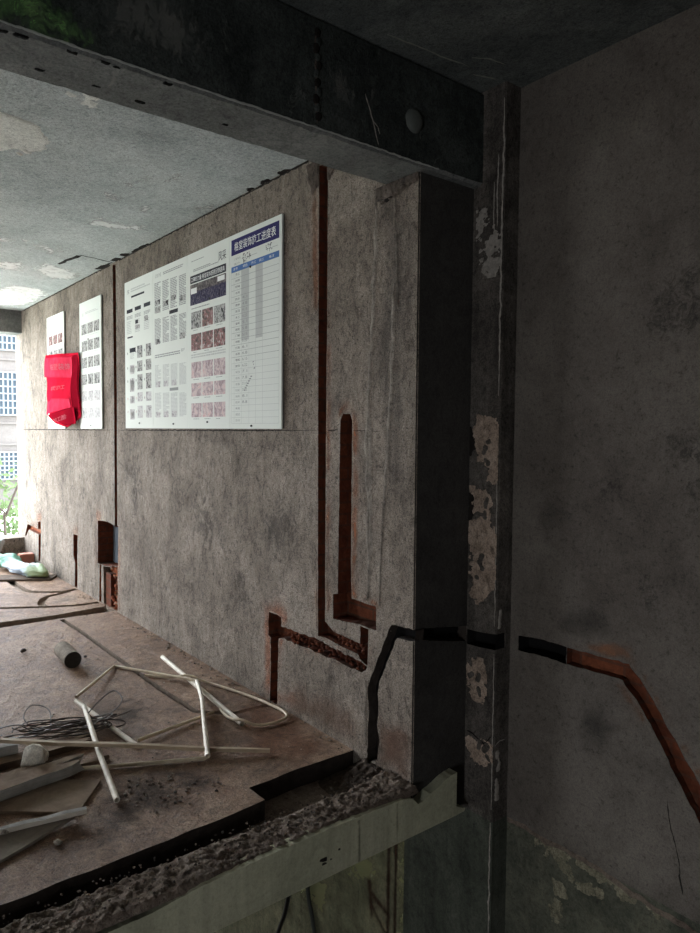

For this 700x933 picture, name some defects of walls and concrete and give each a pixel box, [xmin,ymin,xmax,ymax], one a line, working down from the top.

peeling [476,208,501,278]
peeling [468,414,499,605]
peeling [466,657,487,704]